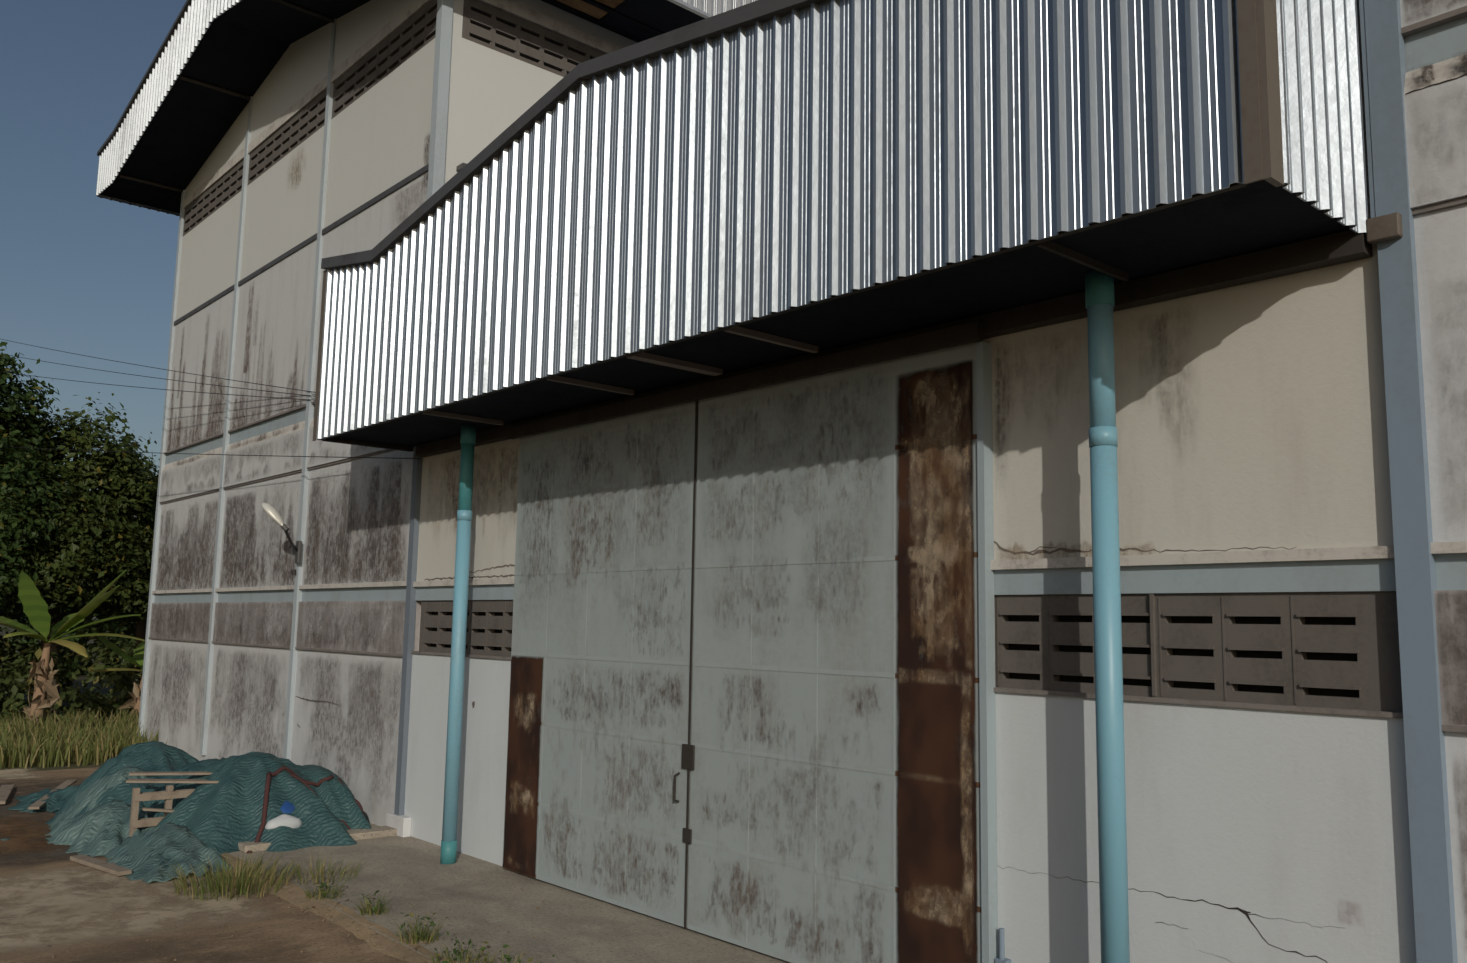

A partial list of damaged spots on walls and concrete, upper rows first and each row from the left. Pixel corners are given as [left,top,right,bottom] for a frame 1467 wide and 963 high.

flaking render [1405,54,1467,95]
leakage [167,342,301,464]
leakage [151,465,404,638]
corrosion [897,361,978,963]
corrosion [503,656,543,878]
crack [1133,888,1340,963]